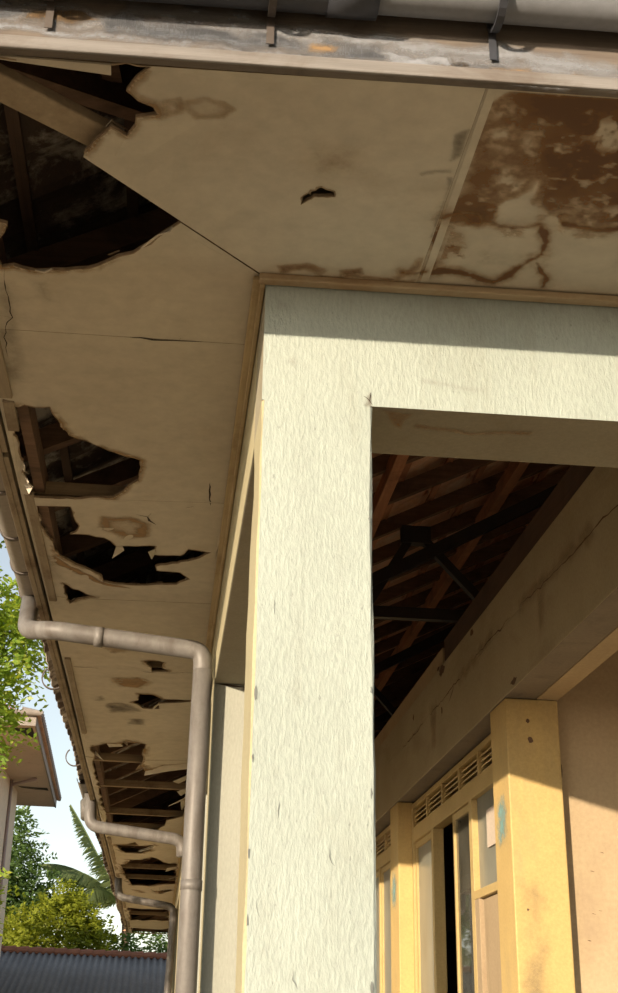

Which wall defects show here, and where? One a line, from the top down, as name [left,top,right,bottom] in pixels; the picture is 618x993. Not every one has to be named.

damp [339,92,618,288]
peeling [141,226,173,249]
crack [4,280,13,356]
crack [137,335,198,343]
peeling [21,461,33,494]
damp [101,517,148,537]
crack [474,505,618,659]
peeling [136,761,187,810]